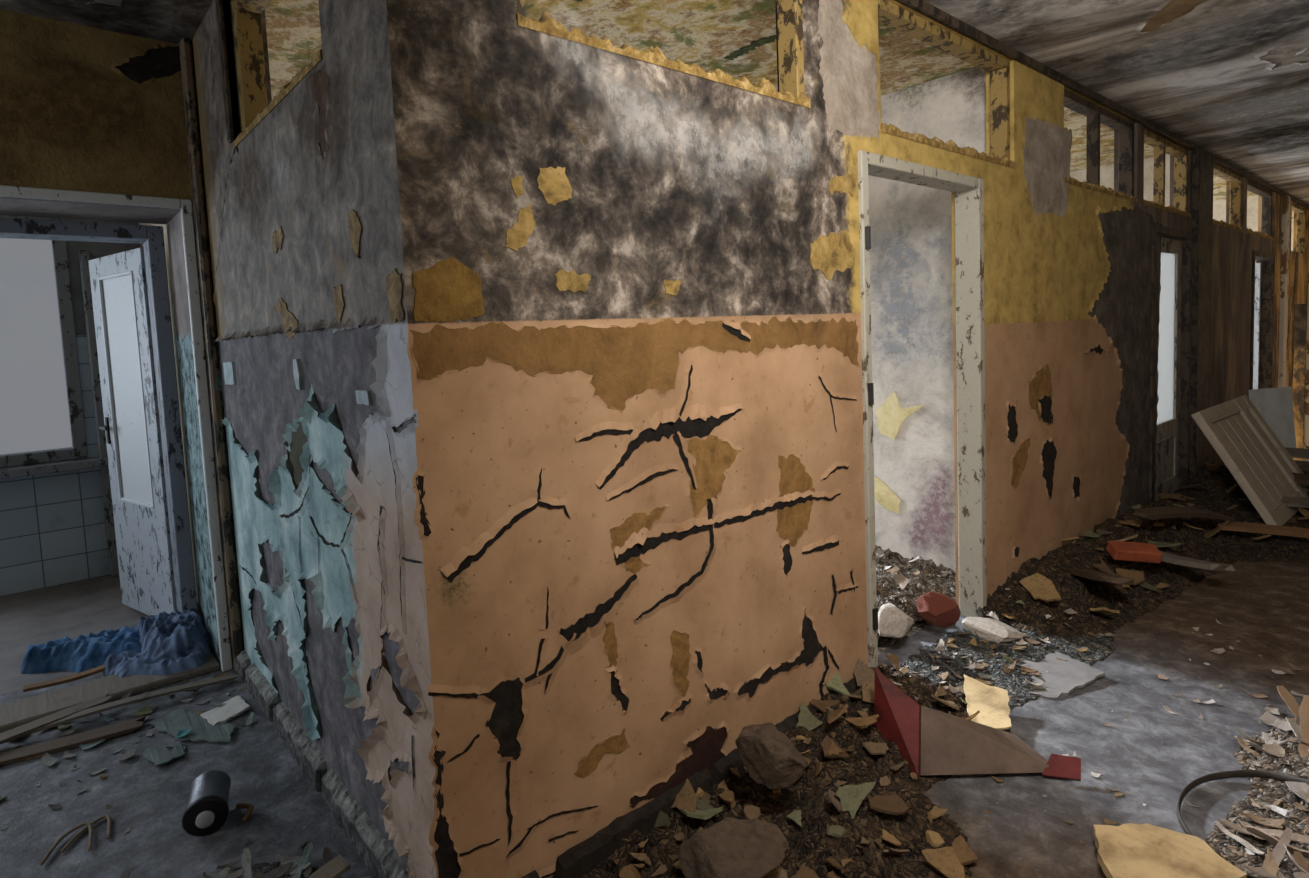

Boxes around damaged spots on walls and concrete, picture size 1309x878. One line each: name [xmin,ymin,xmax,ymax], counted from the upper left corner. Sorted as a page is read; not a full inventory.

damp [606,84,810,190]
peeling [516,0,1191,519]
peeling [214,313,419,522]
peeling [407,314,860,416]
crack [239,388,573,699]
peeling [608,503,671,575]
crack [525,363,859,697]
peeling [775,452,816,581]
peeling [247,535,466,878]
crack [408,736,416,789]
crack [446,734,480,763]
crack [454,759,598,878]